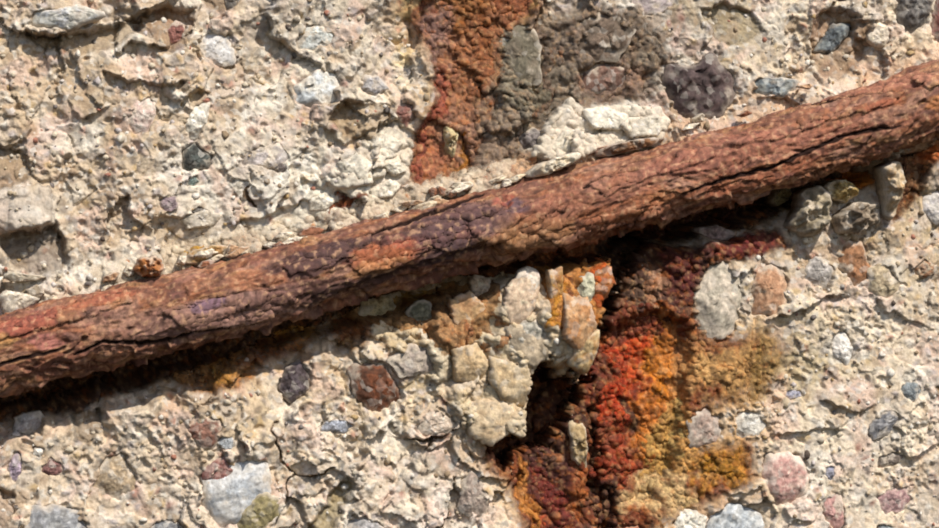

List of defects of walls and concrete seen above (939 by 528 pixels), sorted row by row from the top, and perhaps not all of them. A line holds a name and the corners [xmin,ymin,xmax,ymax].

corrosion [288,0,659,234]
corrosion [906,62,939,89]
corrosion [589,146,715,196]
corrosion [894,139,939,218]
corrosion [0,170,875,528]
peeling [370,233,641,528]
crack [271,421,335,504]